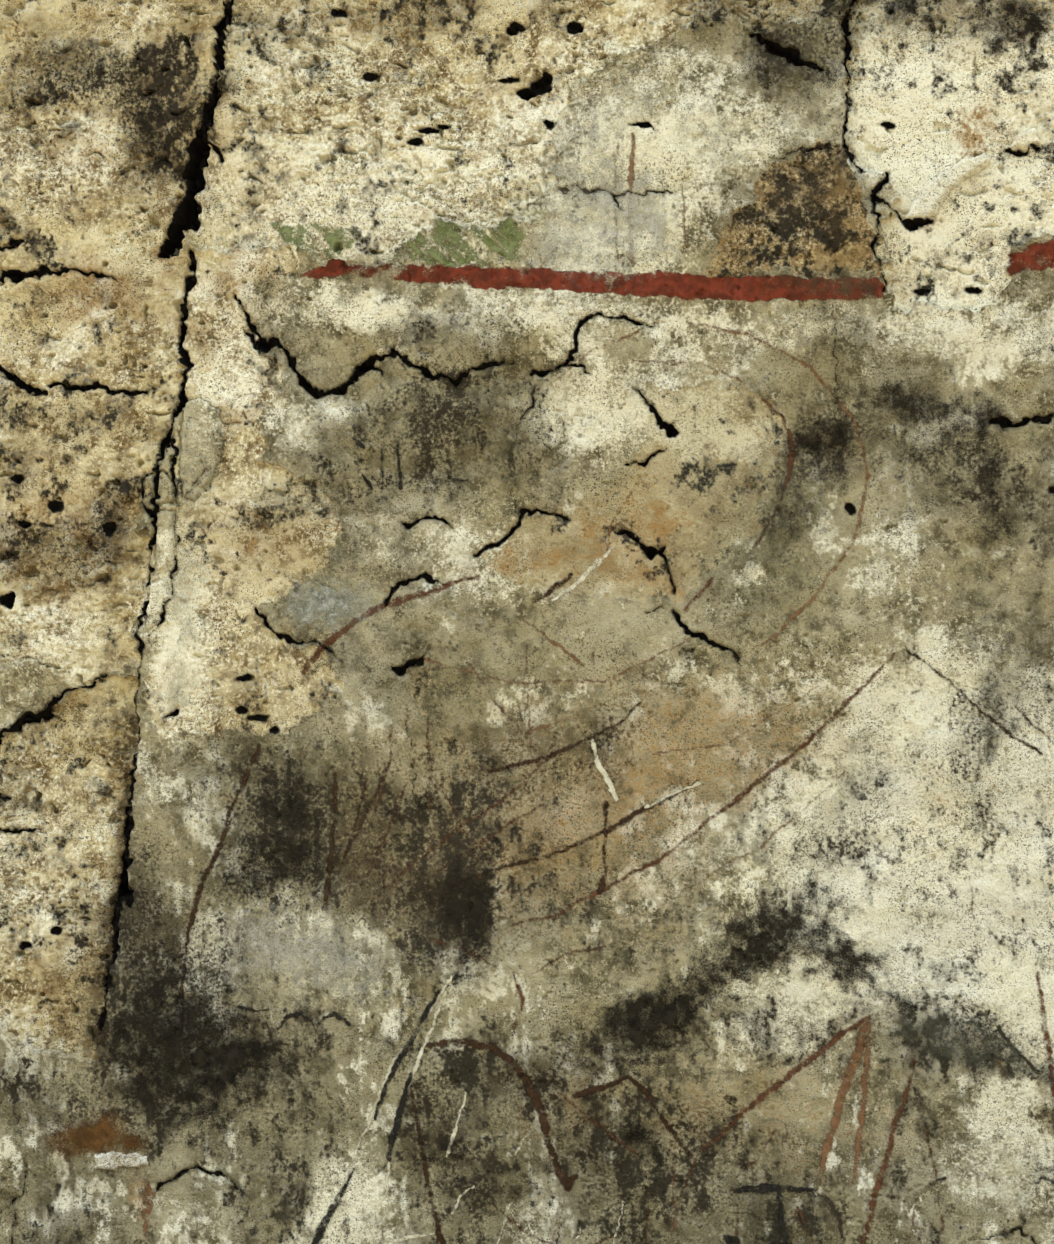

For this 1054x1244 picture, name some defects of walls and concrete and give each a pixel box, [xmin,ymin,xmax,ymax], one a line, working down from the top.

crack [750,0,934,292]
spalling [707,0,1054,316]
crack [0,0,234,1035]
crack [255,607,343,663]
crack [385,573,439,606]
spalling [0,0,846,1067]
crack [234,295,656,557]
crack [615,530,740,662]
damp [765,420,850,541]
mould [873,383,1004,518]
efflorescence [219,903,382,997]
damp [889,1004,1054,1084]